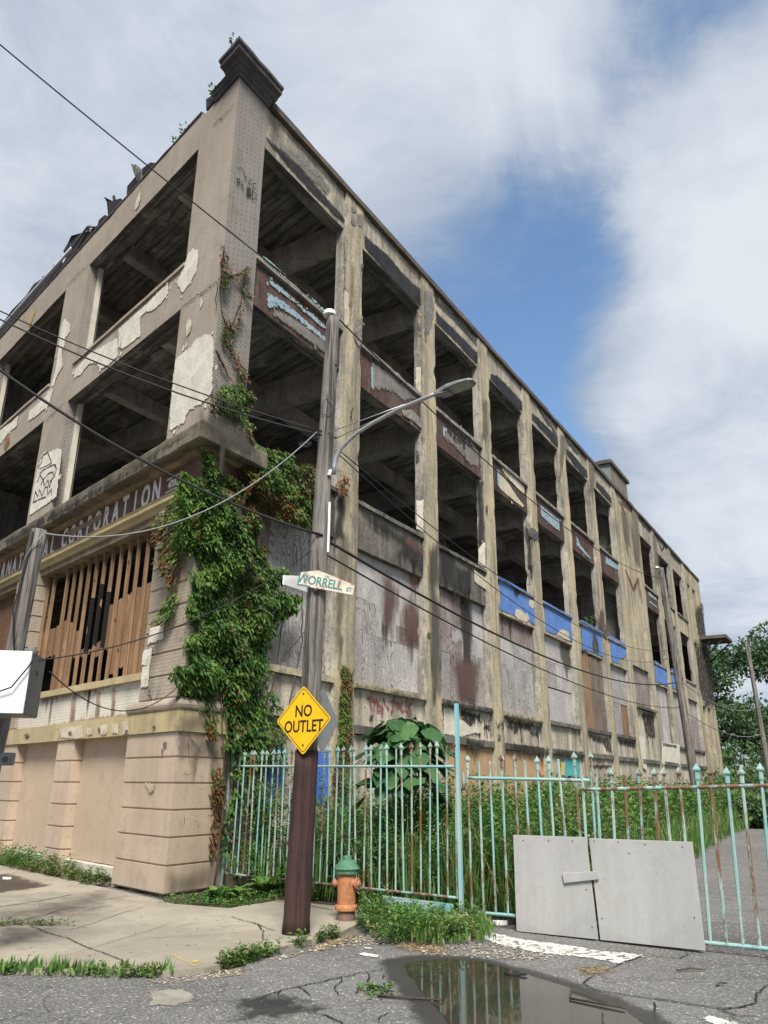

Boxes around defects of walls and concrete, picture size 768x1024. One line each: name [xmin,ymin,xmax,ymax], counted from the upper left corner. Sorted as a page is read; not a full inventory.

peeling [0,248,198,443]
peeling [169,318,217,434]
peeling [264,257,326,341]
damp [267,138,478,363]
peeling [29,449,61,516]
damp [362,509,494,756]
peeling [474,541,626,663]
crack [255,969,390,1024]